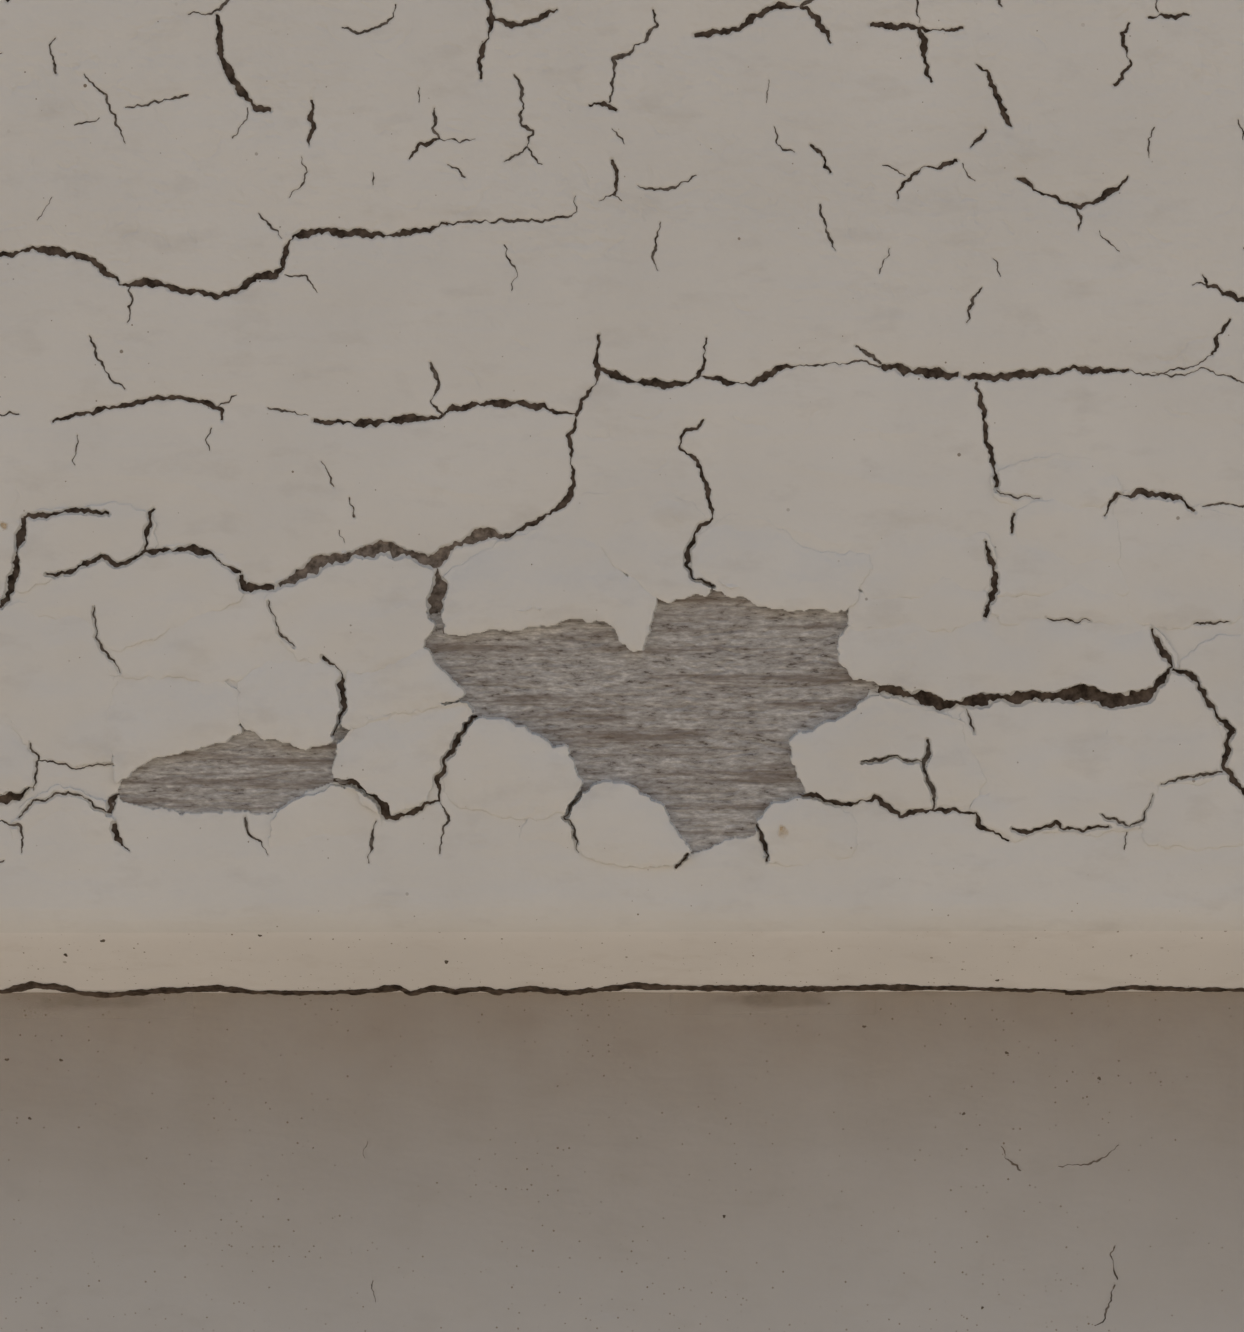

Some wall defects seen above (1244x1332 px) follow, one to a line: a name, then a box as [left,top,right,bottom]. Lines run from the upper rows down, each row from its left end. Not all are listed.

crack [694,0,831,44]
crack [870,0,963,83]
crack [1113,0,1190,87]
crack [0,0,697,323]
crack [882,64,1012,199]
crack [1016,127,1155,252]
crack [0,275,1244,735]
crack [0,743,130,863]
crack [333,715,478,863]
peeling [0,493,986,869]
crack [799,628,1244,850]
crack [0,981,1244,998]